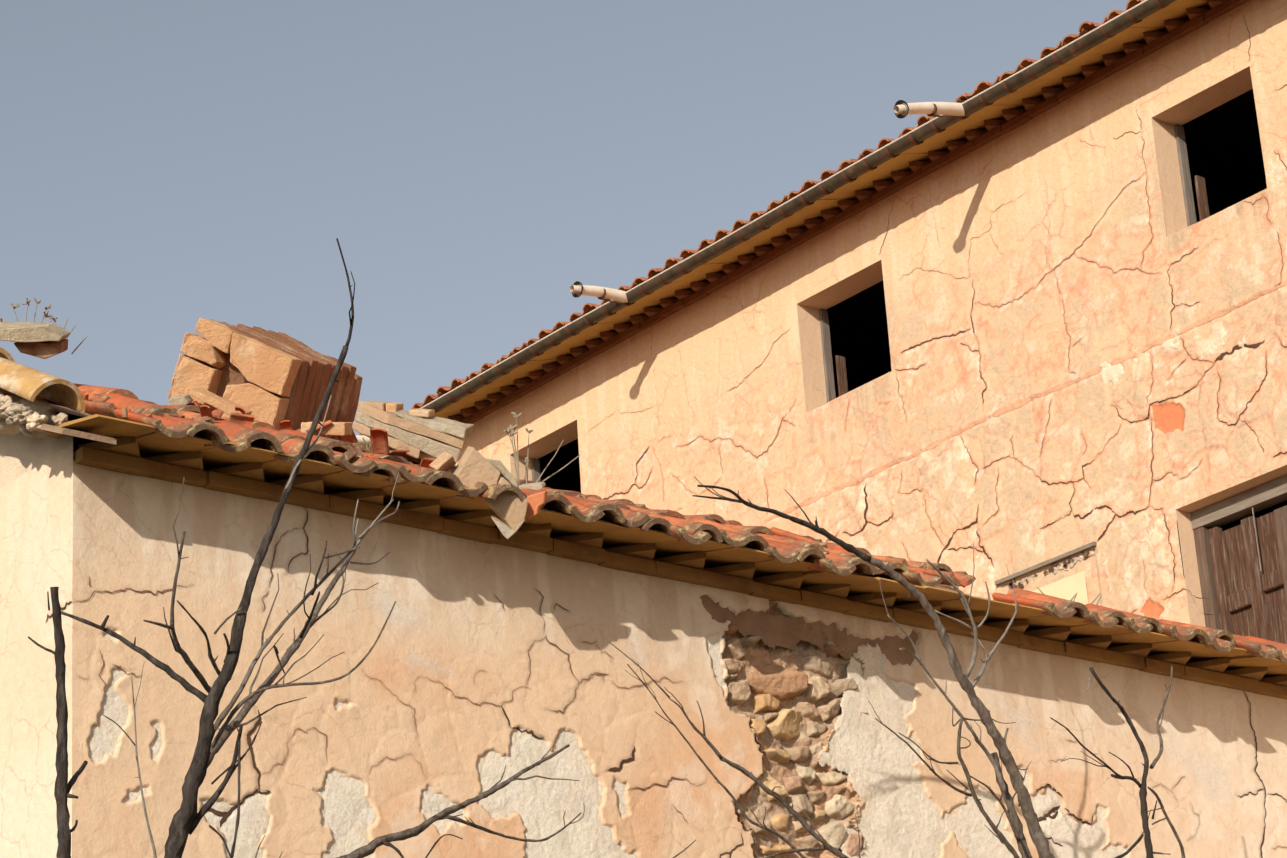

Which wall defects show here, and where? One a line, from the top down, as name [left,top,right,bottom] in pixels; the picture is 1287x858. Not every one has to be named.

peeling [766,281,1287,521]
crack [826,109,1287,611]
peeling [201,793,270,858]
crack [209,709,327,828]
peeling [317,770,376,858]
crack [365,590,676,779]
peeling [420,728,637,858]
crack [608,746,704,820]
spalling [700,595,1022,858]
crack [1018,740,1095,855]
peeling [1018,766,1127,858]
crack [1238,692,1287,858]